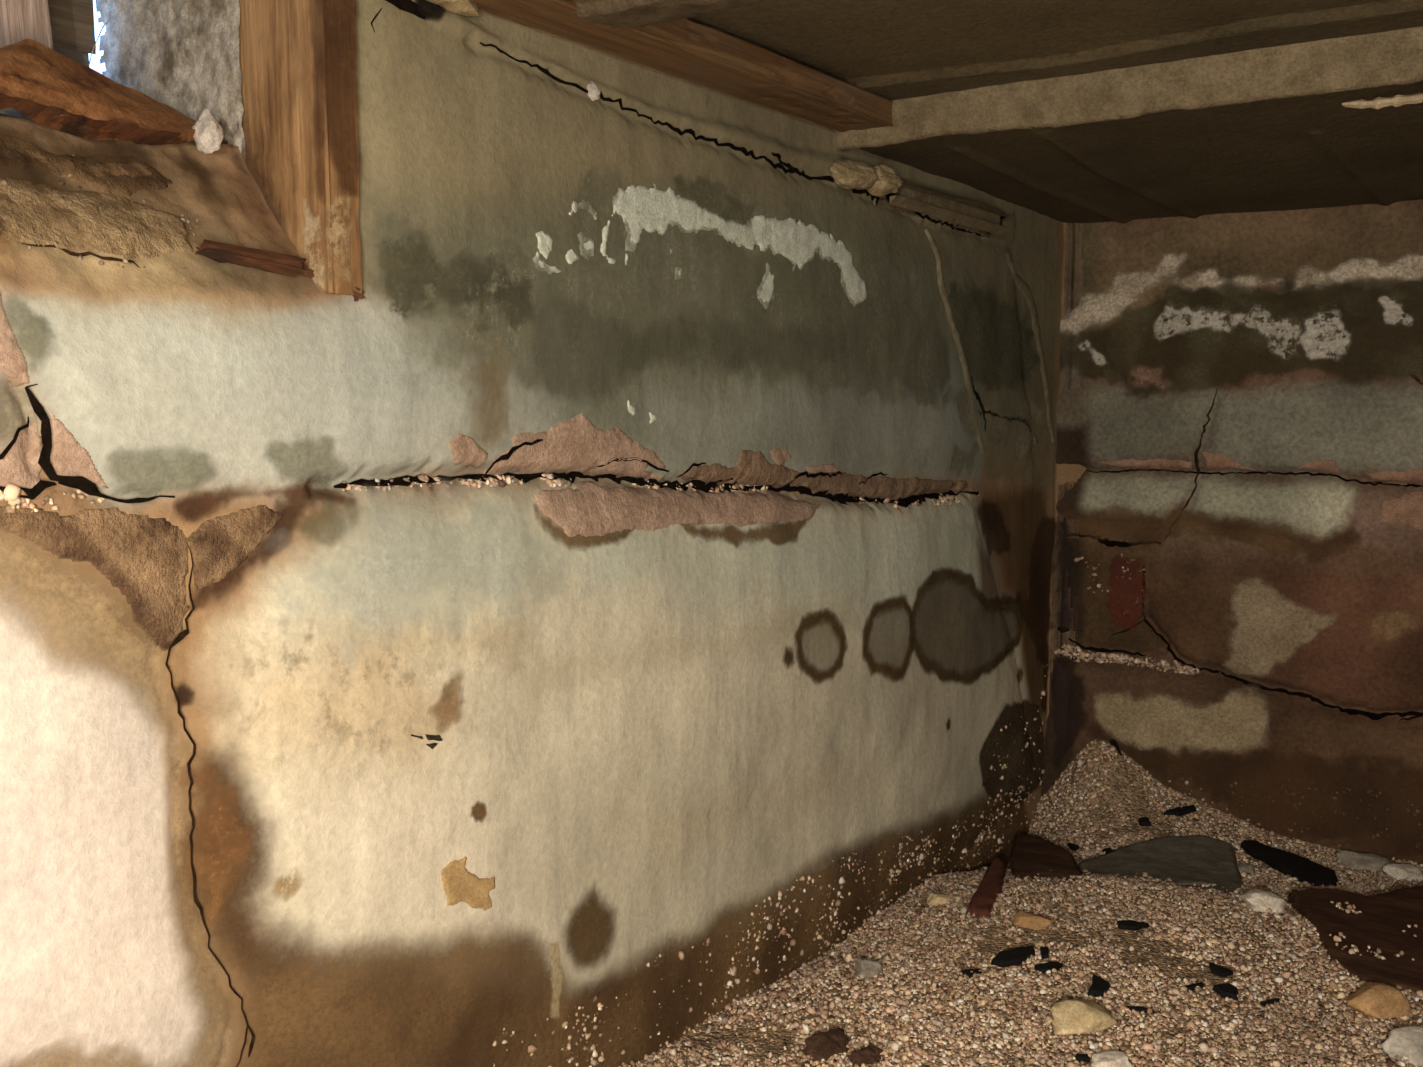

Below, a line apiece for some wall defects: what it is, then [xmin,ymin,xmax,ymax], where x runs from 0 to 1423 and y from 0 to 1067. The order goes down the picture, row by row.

crack [480,42,990,238]
peeling [533,184,867,309]
spalling [0,292,29,387]
damp [1060,278,1423,397]
damp [0,382,36,441]
damp [195,440,350,607]
peeling [627,400,656,424]
crack [333,439,979,508]
spalling [448,413,973,537]
crack [1057,388,1423,721]
crack [165,545,255,1067]
damp [0,502,1423,1067]